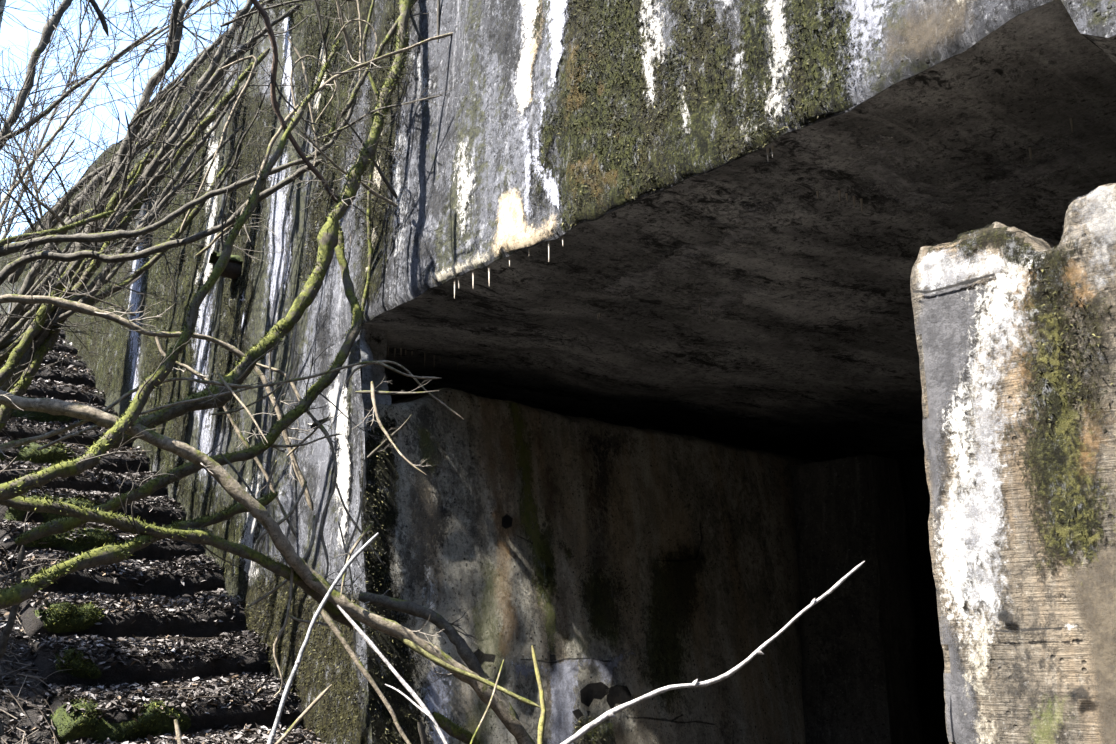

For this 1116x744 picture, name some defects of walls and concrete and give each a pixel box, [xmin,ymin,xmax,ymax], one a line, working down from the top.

leakage [483,0,567,215]
leakage [640,0,665,99]
leakage [764,0,790,116]
leakage [128,237,142,400]
leakage [192,108,219,392]
leakage [267,156,293,307]
leakage [374,133,476,265]
leakage [195,408,214,456]
leakage [392,397,454,610]
leakage [916,253,1044,744]